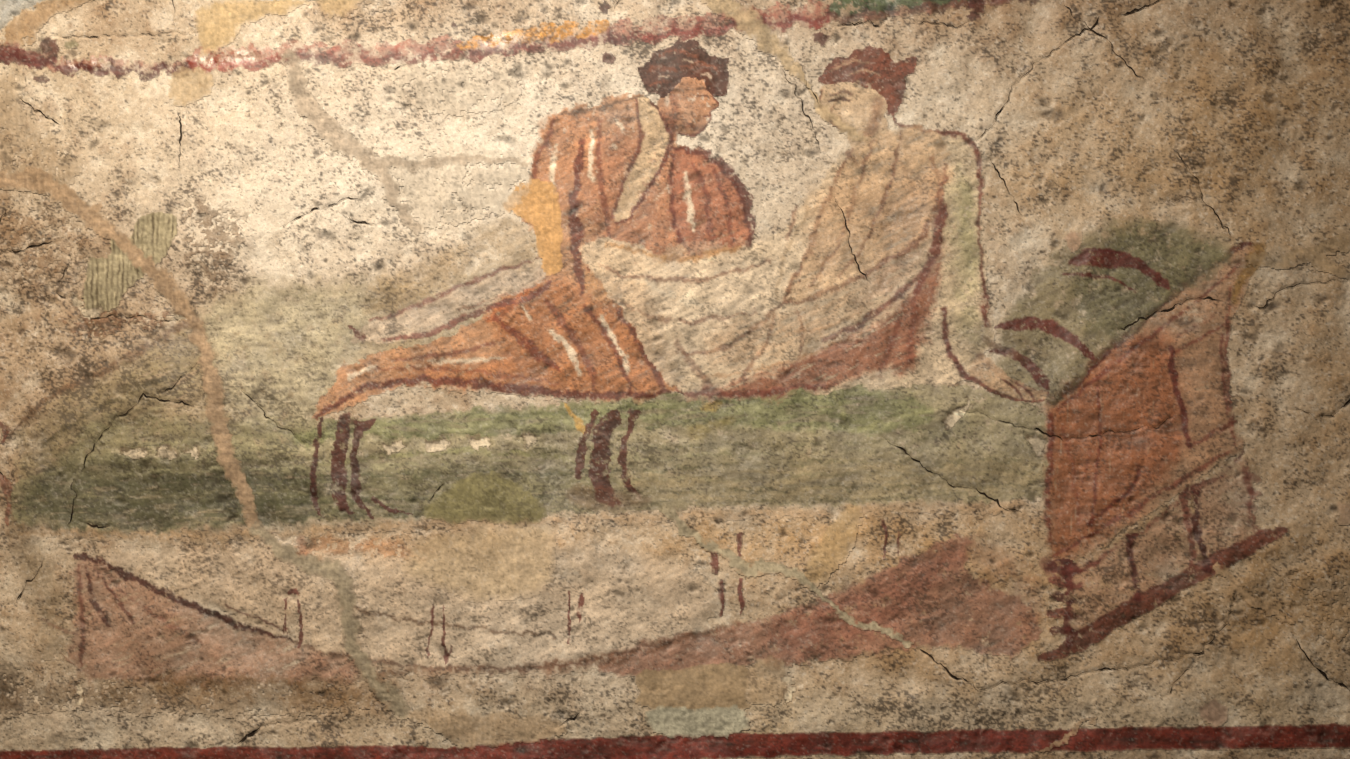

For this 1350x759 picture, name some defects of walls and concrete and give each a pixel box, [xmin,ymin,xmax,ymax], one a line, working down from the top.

damp [972,0,985,16]
crack [977,0,1159,213]
crack [1163,145,1350,308]
crack [1120,296,1222,330]
crack [0,164,411,721]
crack [892,444,1022,511]